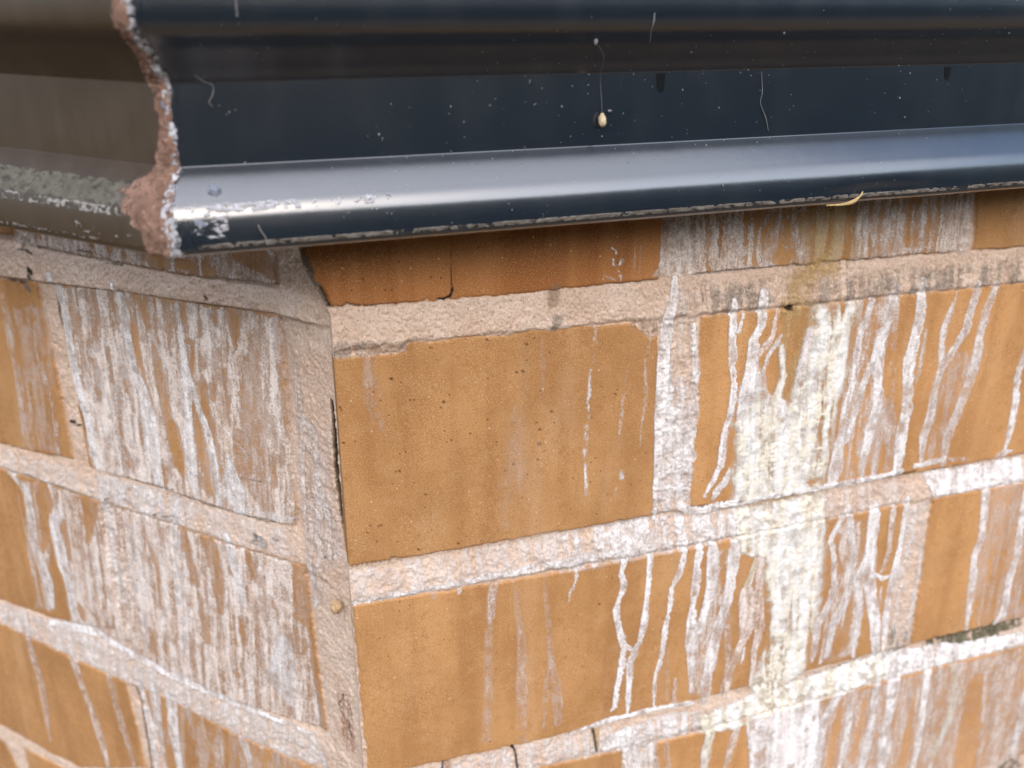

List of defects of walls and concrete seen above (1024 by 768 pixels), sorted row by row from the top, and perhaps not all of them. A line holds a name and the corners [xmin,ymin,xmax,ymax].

damp [1,271,342,768]
crack [331,399,344,524]
damp [352,193,1024,768]